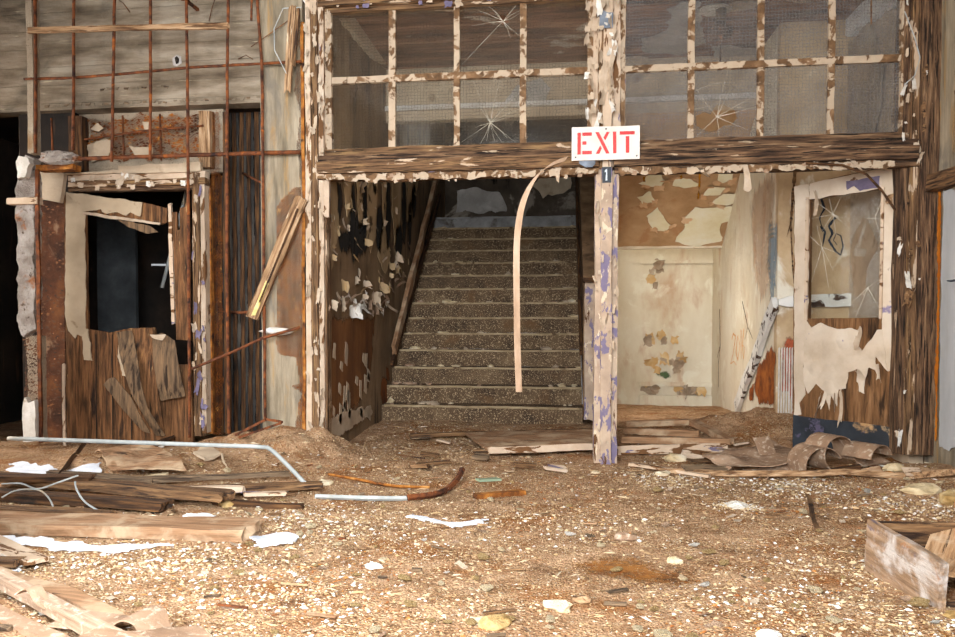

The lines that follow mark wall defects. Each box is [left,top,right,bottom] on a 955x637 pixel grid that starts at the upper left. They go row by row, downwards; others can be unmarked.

peeling [418,0,463,8]
peeling [640,1,706,55]
peeling [303,0,339,135]
peeling [584,0,620,127]
peeling [900,64,928,103]
peeling [902,102,927,163]
peeling [533,169,582,198]
peeling [629,167,737,247]
peeling [897,237,921,258]
spalling [305,173,425,436]
peeling [902,271,921,308]
peeling [815,389,843,428]